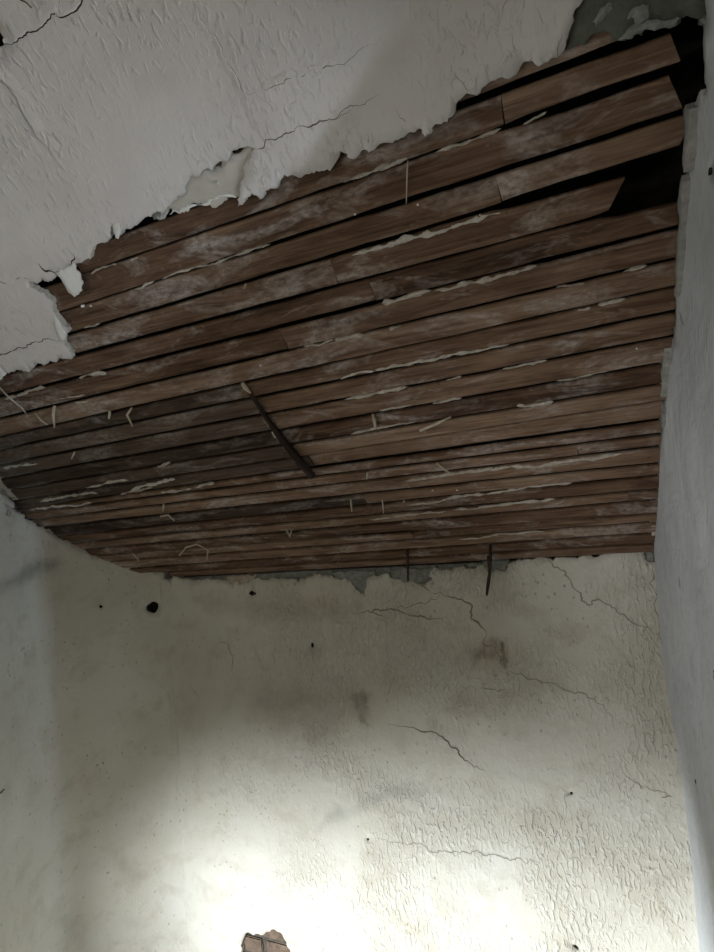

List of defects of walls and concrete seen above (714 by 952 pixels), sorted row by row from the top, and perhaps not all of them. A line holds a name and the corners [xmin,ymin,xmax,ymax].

crack [3,0,83,45]
spalling [565,0,707,50]
crack [259,94,379,149]
flaking render [152,146,255,220]
flaking render [55,263,84,297]
flaking render [53,313,67,341]
spalling [0,476,18,517]
crack [548,560,662,648]
crack [351,585,614,723]
crack [392,724,486,772]
crack [377,838,541,864]
spalling [243,929,290,952]